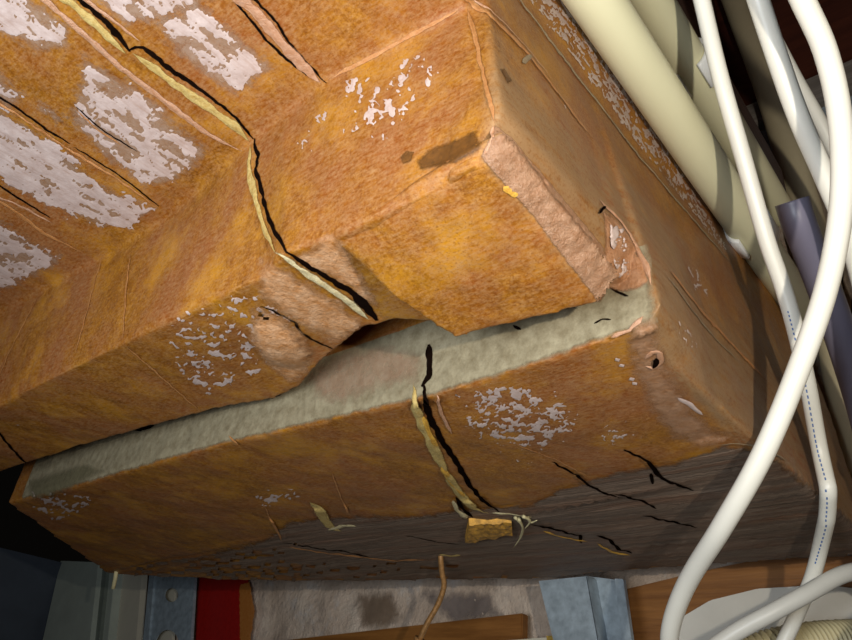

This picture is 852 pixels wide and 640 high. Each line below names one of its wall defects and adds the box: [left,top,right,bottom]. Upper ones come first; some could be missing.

crack [0,185,82,253]
crack [0,97,158,207]
crack [40,0,378,321]
peeling [482,126,651,301]
crack [411,344,632,556]
crack [554,449,697,528]